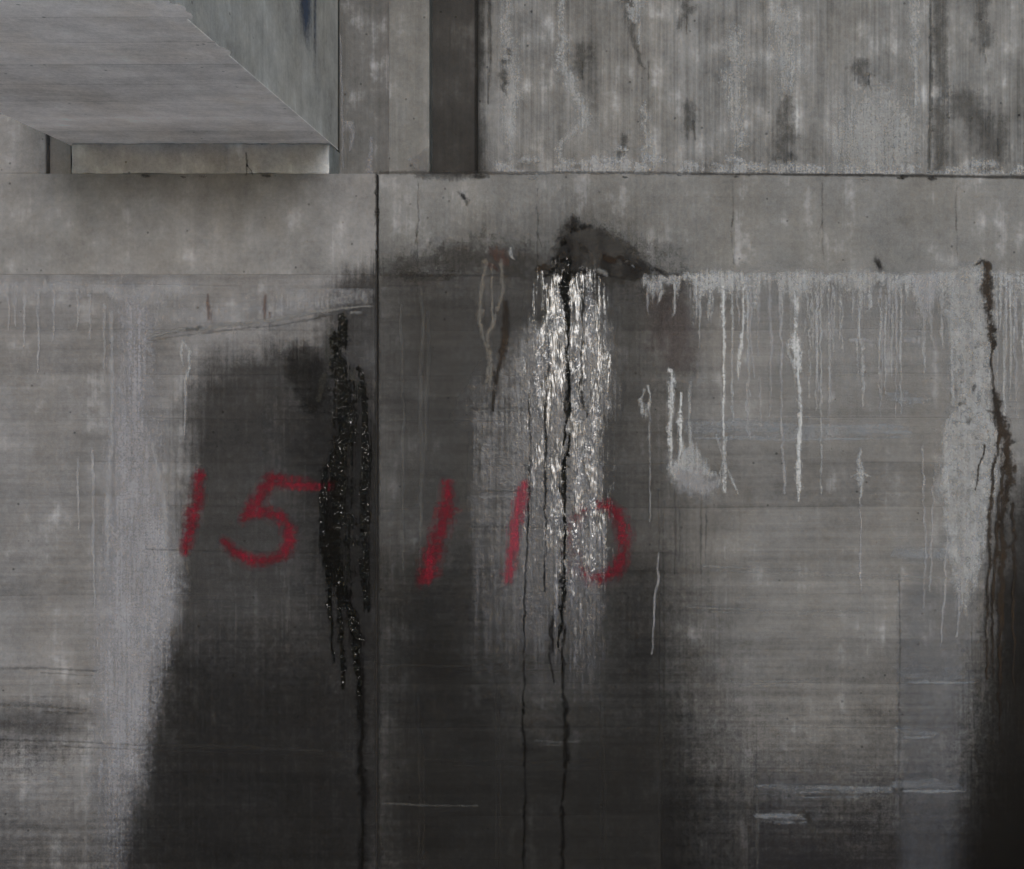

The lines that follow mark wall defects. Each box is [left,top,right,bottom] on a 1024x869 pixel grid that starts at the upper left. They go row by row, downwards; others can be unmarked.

leakage [97,287,175,840]
leakage [125,172,380,869]
leakage [521,257,614,869]
leakage [676,390,691,465]
leakage [699,277,749,492]
leakage [779,272,843,501]
leakage [990,281,1024,416]